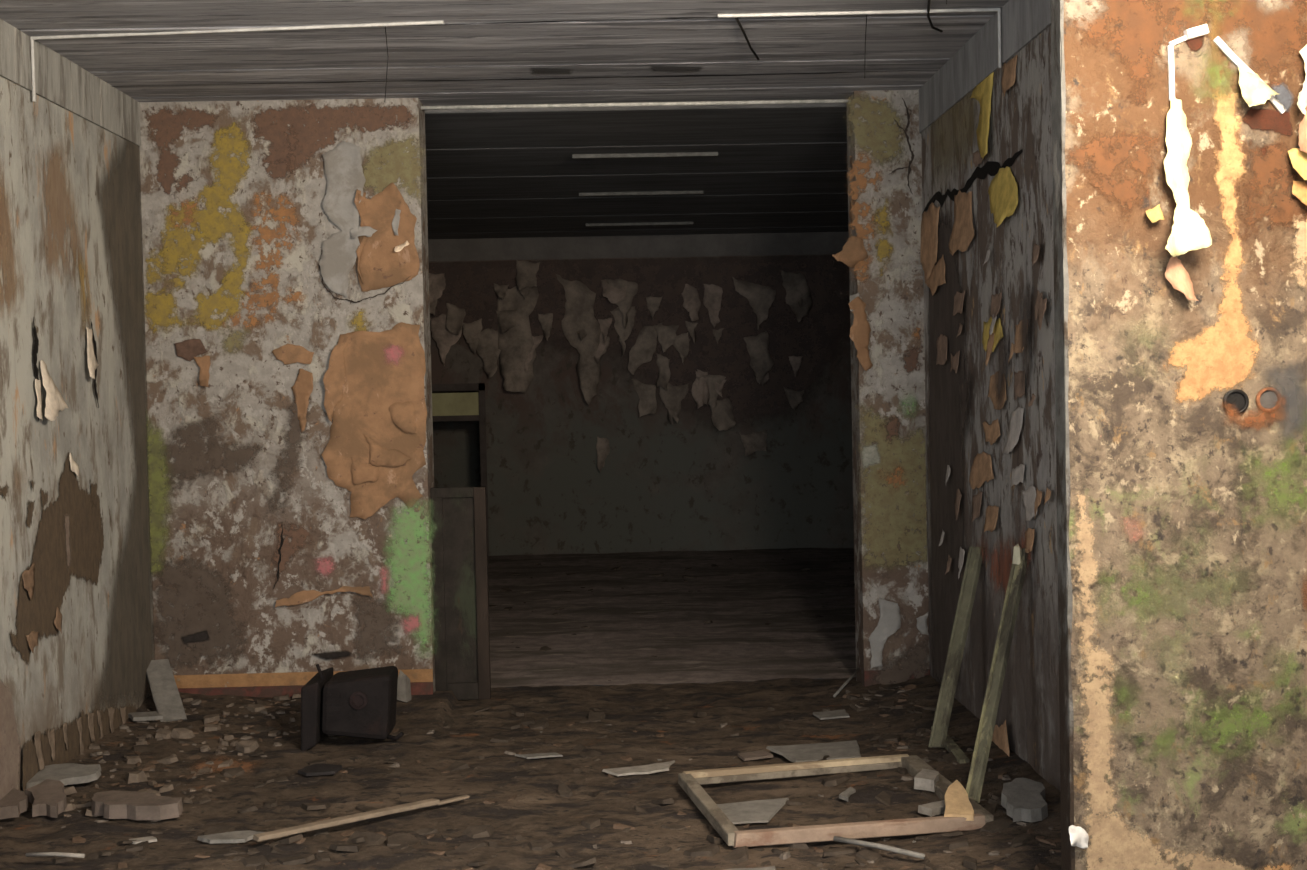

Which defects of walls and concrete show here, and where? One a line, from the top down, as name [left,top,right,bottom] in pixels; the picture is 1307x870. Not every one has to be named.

peeling [0,452,104,665]
peeling [142,106,219,228]
peeling [253,102,413,179]
peeling [269,322,427,661]
peeling [354,182,420,292]
crack [203,70,1023,214]
peeling [848,293,873,371]
peeling [903,203,970,438]
peeling [945,290,1051,553]
peeling [1064,0,1307,287]
peeling [1072,491,1292,870]
leakage [1155,664,1305,755]